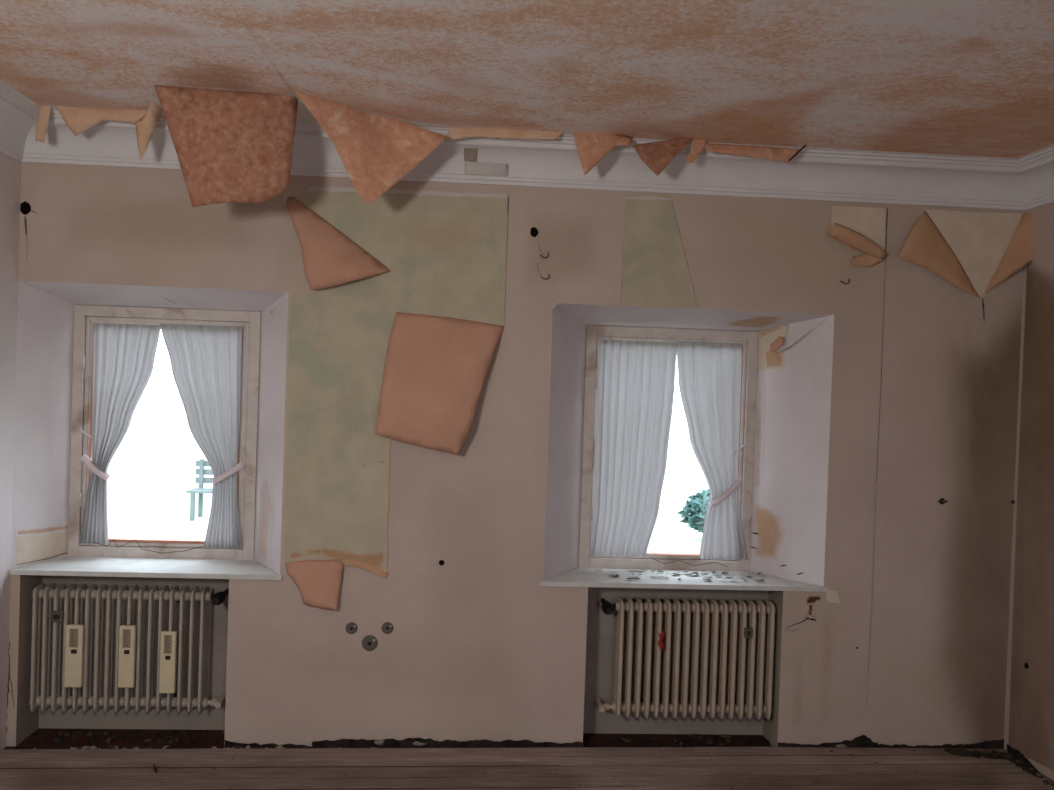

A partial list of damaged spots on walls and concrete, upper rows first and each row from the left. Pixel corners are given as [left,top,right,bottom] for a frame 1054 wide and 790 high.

flaking render [831,206,888,252]
flaking render [924,209,1022,321]
flaking render [284,186,509,573]